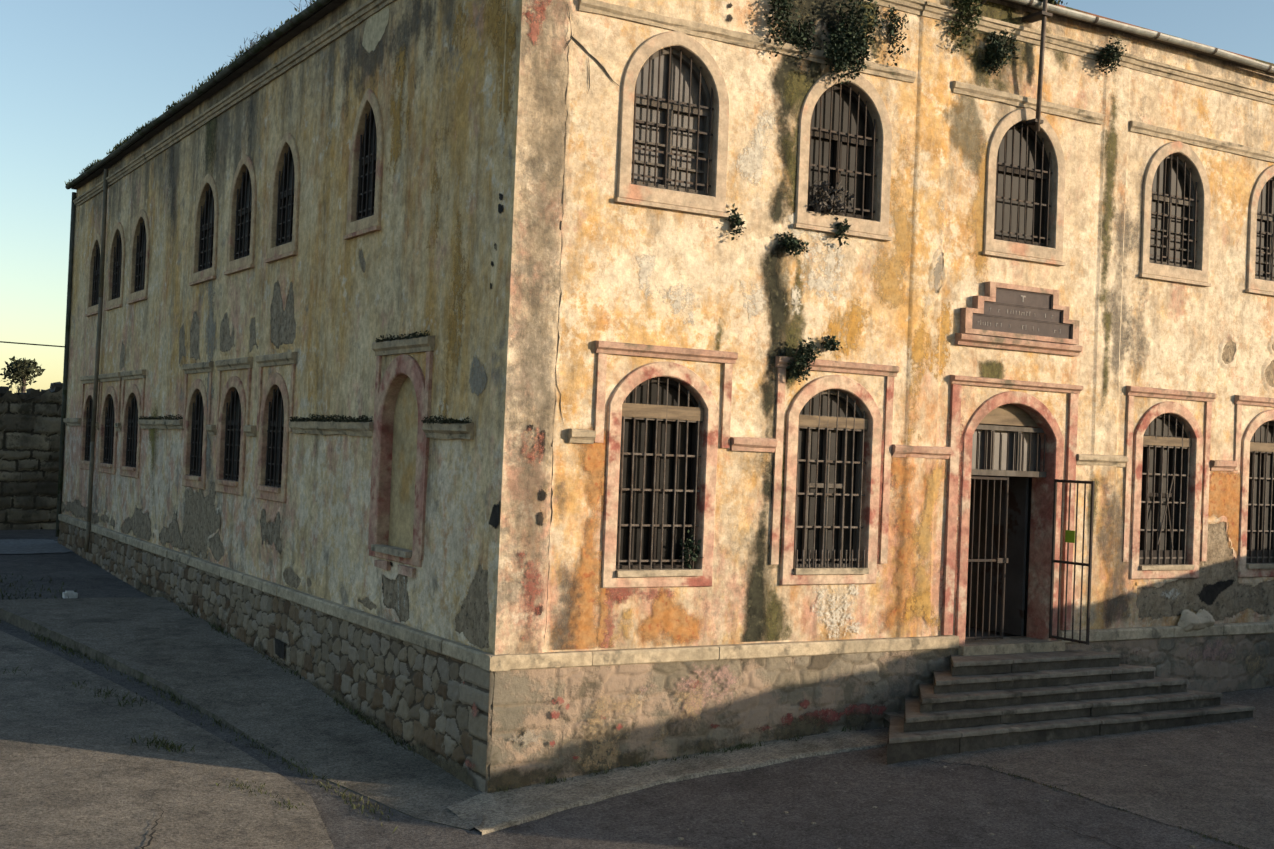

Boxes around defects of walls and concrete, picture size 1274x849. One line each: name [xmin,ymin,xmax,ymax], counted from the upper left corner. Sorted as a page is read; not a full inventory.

leakage [769,0,822,223]
leakage [1099,95,1145,406]
flaking render [219,273,301,357]
crack [545,4,620,632]
leakage [762,244,806,417]
leakage [823,300,869,359]
flaking render [1217,333,1239,370]
flaking render [1261,332,1274,394]
flaking render [61,482,228,564]
flaking render [450,549,494,653]
leakage [743,455,791,642]
flaking render [1131,516,1274,624]